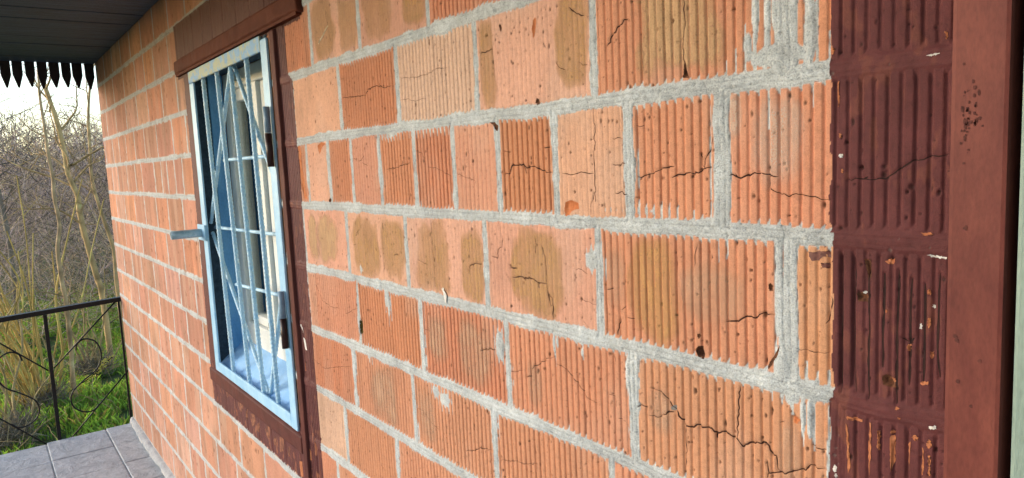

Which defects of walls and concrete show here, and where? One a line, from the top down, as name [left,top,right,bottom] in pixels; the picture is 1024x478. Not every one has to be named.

leakage [555,0,585,81]
crack [344,67,443,101]
crack [506,110,830,203]
crack [848,153,949,181]
spalling [564,200,579,216]
leakage [353,220,404,273]
leakage [463,236,483,302]
crack [469,240,554,319]
leakage [512,235,560,313]
crack [512,357,826,478]
peeling [832,407,936,477]